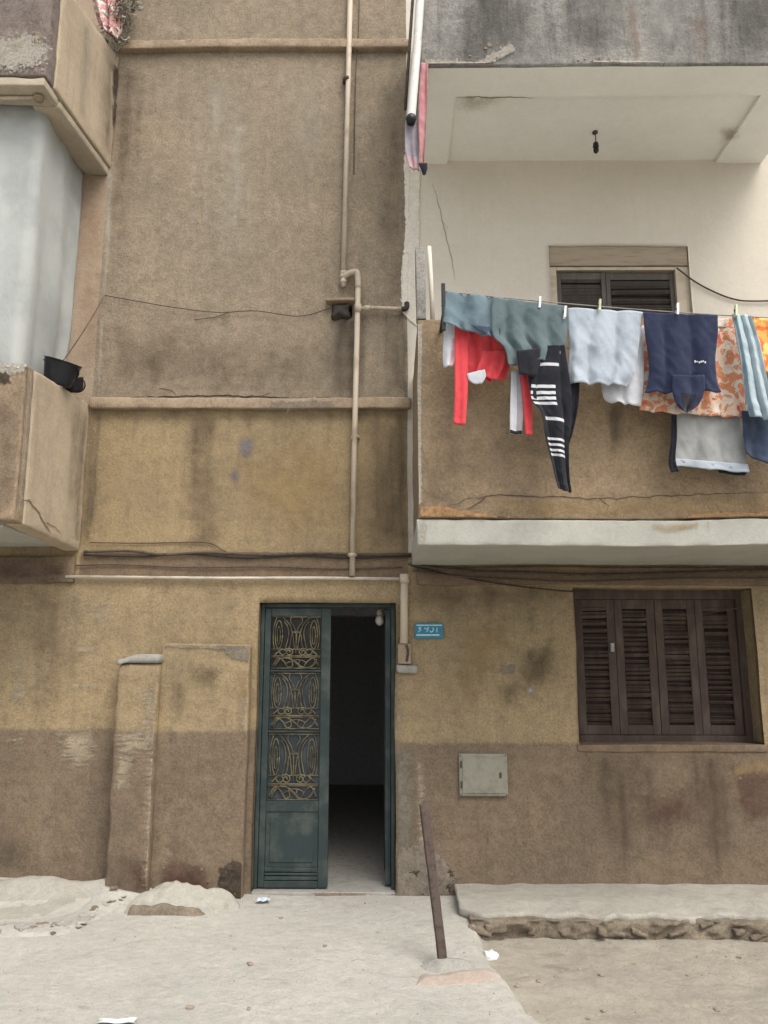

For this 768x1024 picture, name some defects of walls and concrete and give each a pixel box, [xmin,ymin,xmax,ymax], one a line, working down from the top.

flaking render [0,31,52,73]
crack [432,184,455,278]
crack [18,499,59,533]
crack [423,492,763,513]
flaking render [162,860,247,899]